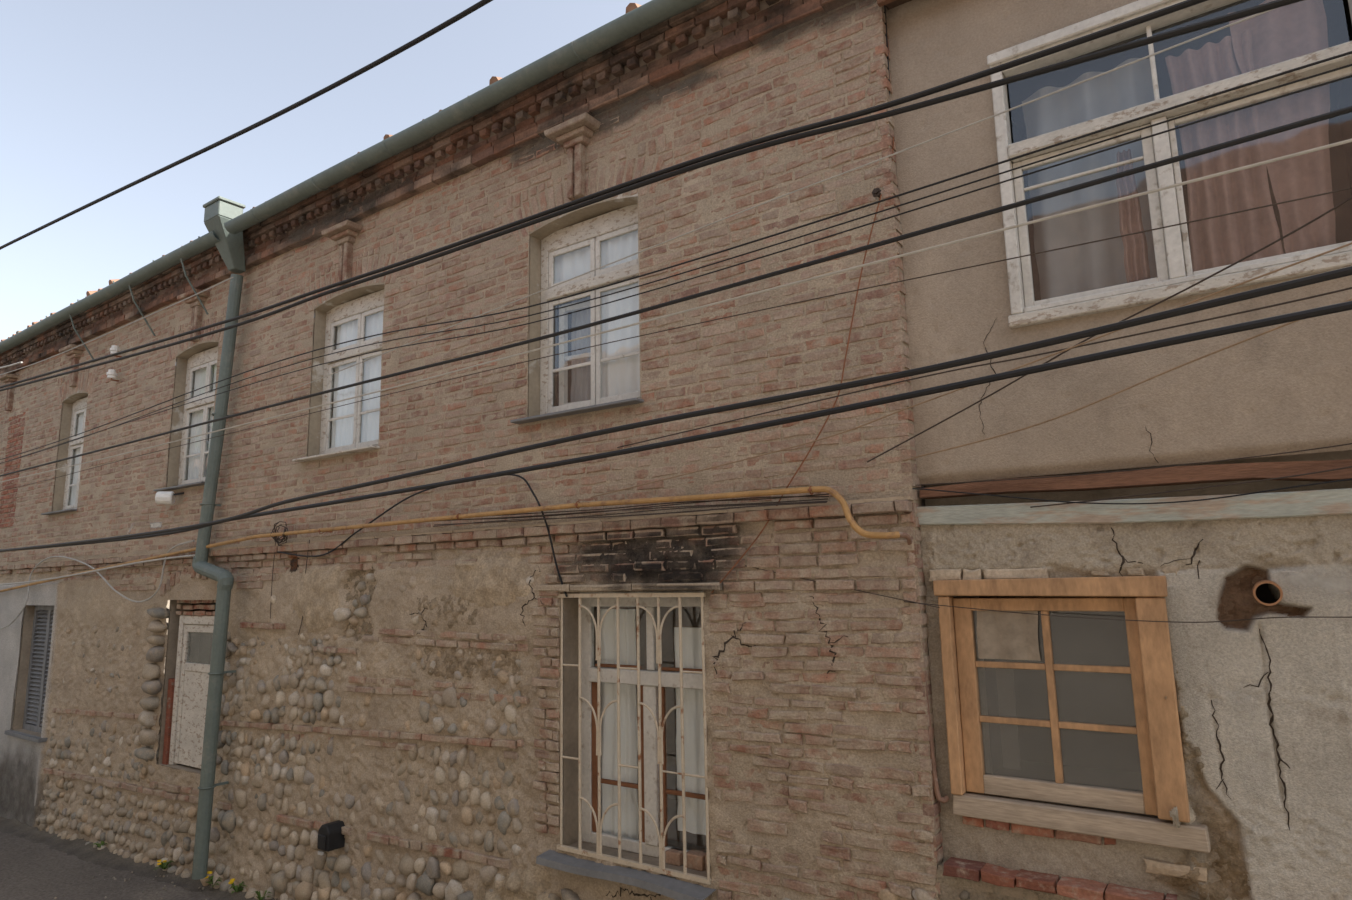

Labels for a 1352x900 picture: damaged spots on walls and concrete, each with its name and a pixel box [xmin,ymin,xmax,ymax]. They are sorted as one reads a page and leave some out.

flaking render [1218,568,1306,629]
crack [1211,700,1231,799]
crack [1243,629,1290,830]